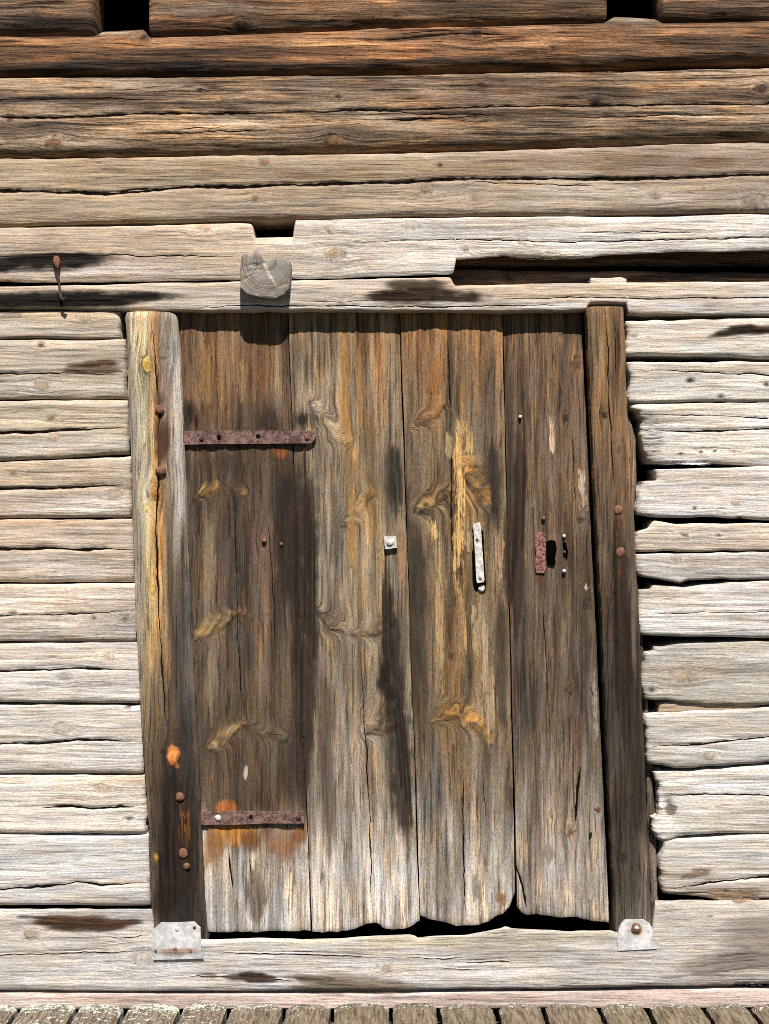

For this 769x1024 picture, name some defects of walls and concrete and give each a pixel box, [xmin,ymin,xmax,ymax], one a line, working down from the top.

crack [0,173,769,196]
crack [150,314,161,427]
crack [0,459,169,737]
rust [215,801,236,811]
crack [574,766,582,821]
rust [178,807,190,846]
rust [206,824,305,862]